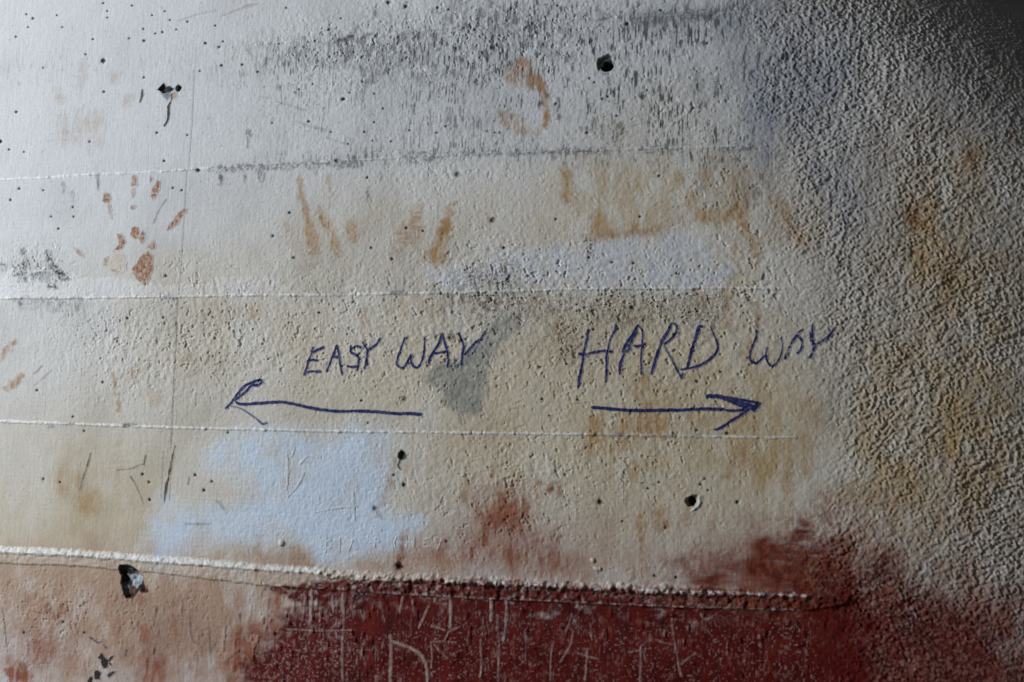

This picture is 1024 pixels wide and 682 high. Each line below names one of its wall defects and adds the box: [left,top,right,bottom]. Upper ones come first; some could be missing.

corrosion [494,52,552,139]
peeling [87,564,185,682]